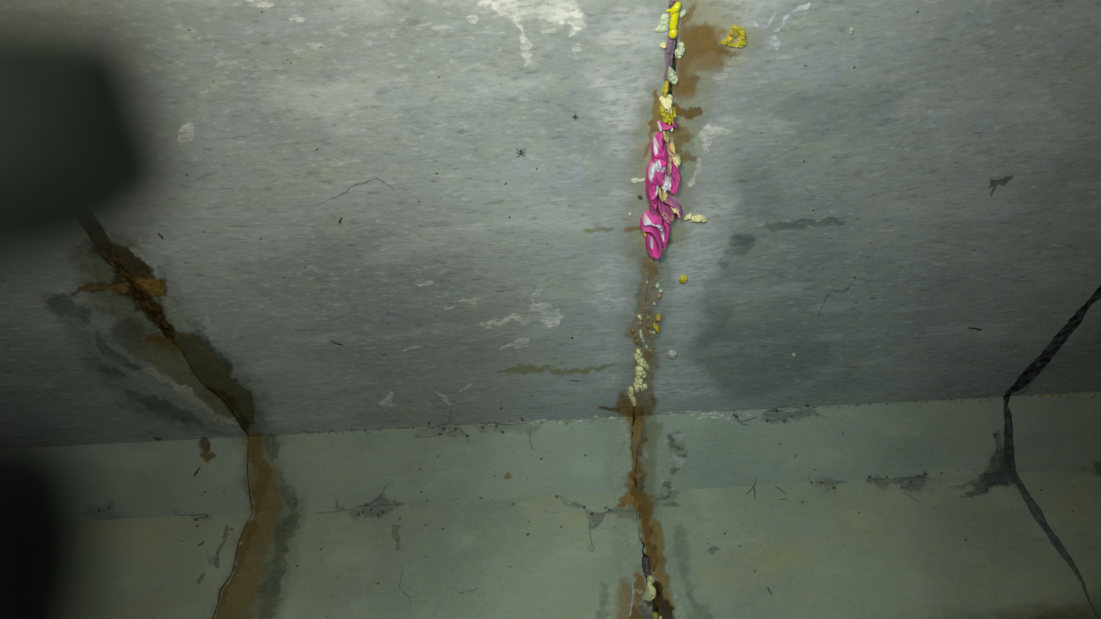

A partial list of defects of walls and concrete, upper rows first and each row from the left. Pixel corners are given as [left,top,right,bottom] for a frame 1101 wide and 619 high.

water stain [467,0,585,66]
crack [664,4,676,97]
corrosion [638,0,739,178]
corrosion [72,244,206,367]
corrosion [666,216,683,247]
crack [96,242,253,619]
corrosion [200,437,215,462]
corrosion [599,393,675,619]
crack [631,407,662,613]
crack [1003,285,1101,617]